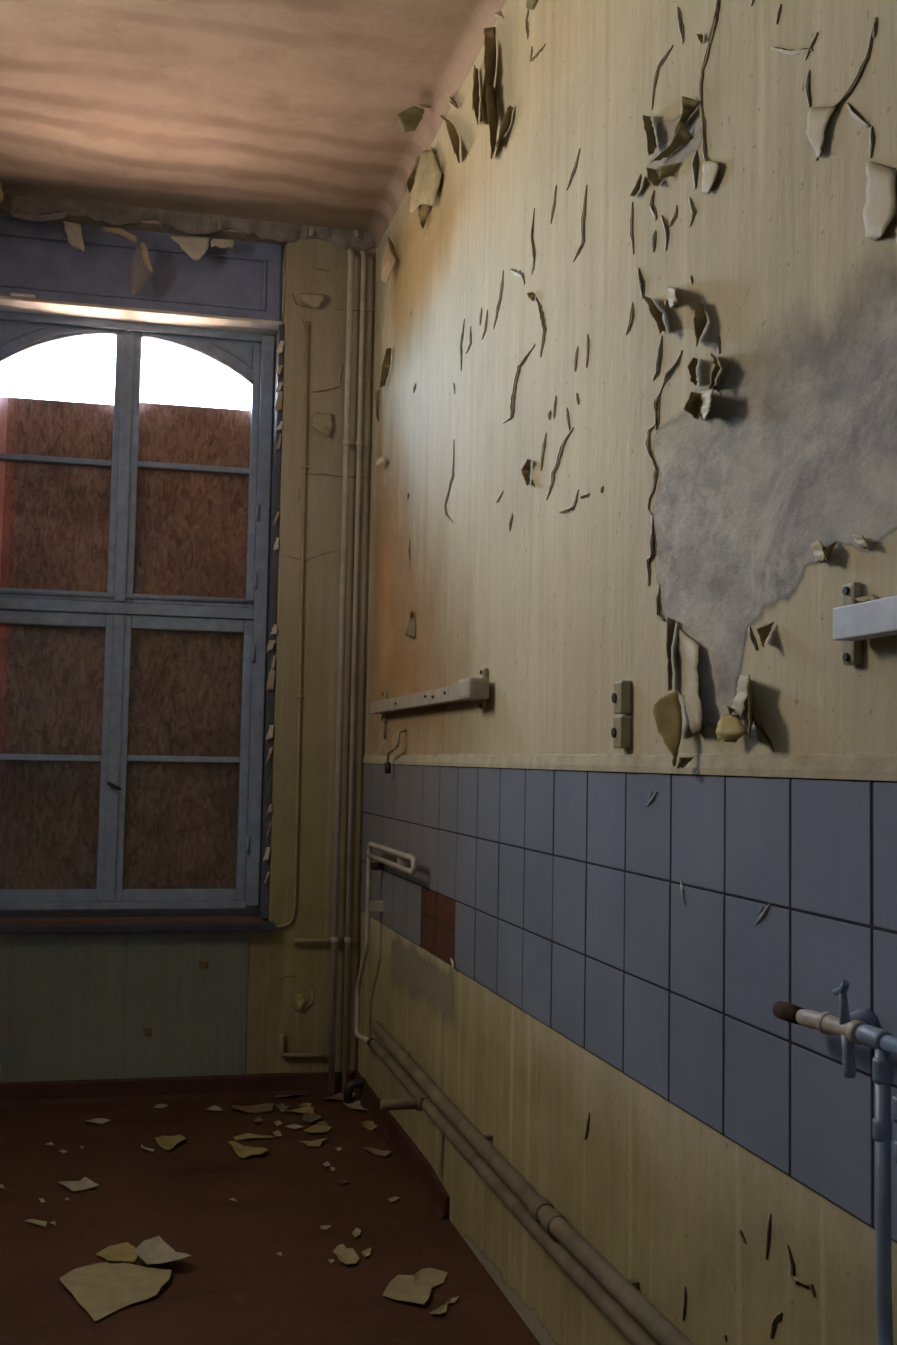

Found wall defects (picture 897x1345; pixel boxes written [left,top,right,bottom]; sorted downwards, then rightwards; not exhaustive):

peeling [396,27,513,164]
peeling [771,17,897,242]
peeling [0,182,85,252]
peeling [103,227,153,295]
peeling [171,218,235,261]
peeling [407,147,442,229]
peeling [626,96,897,769]